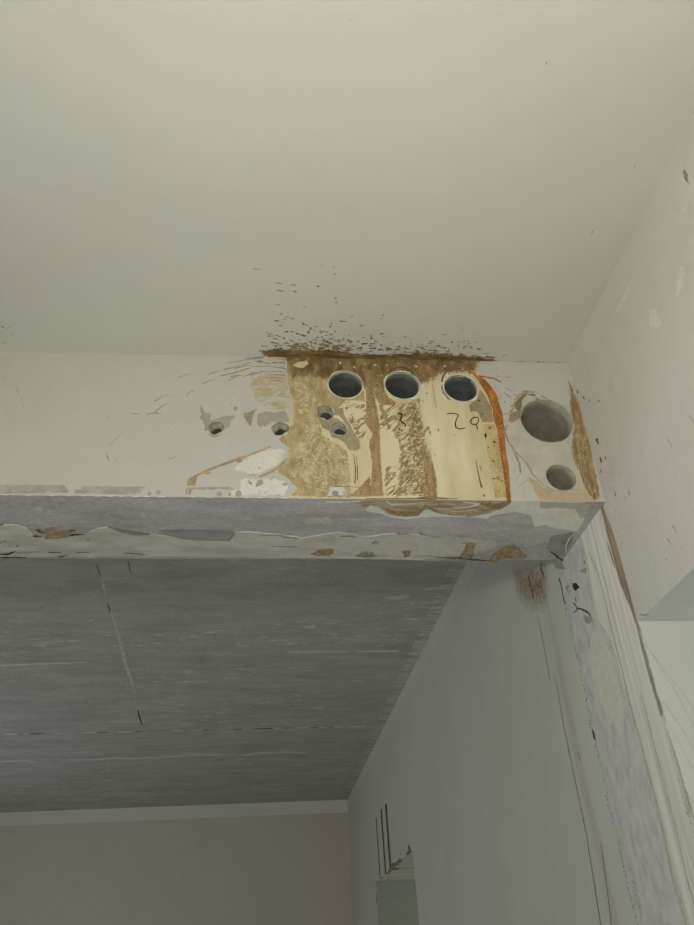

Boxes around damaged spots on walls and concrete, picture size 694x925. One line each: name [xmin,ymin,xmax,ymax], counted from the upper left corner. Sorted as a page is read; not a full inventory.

peeling [200,393,291,438]
peeling [317,371,364,451]
corrosion [228,304,539,501]
spalling [441,375,478,402]
crack [0,524,26,558]
peeling [0,524,526,563]
spalling [546,532,577,560]
crack [48,539,144,733]